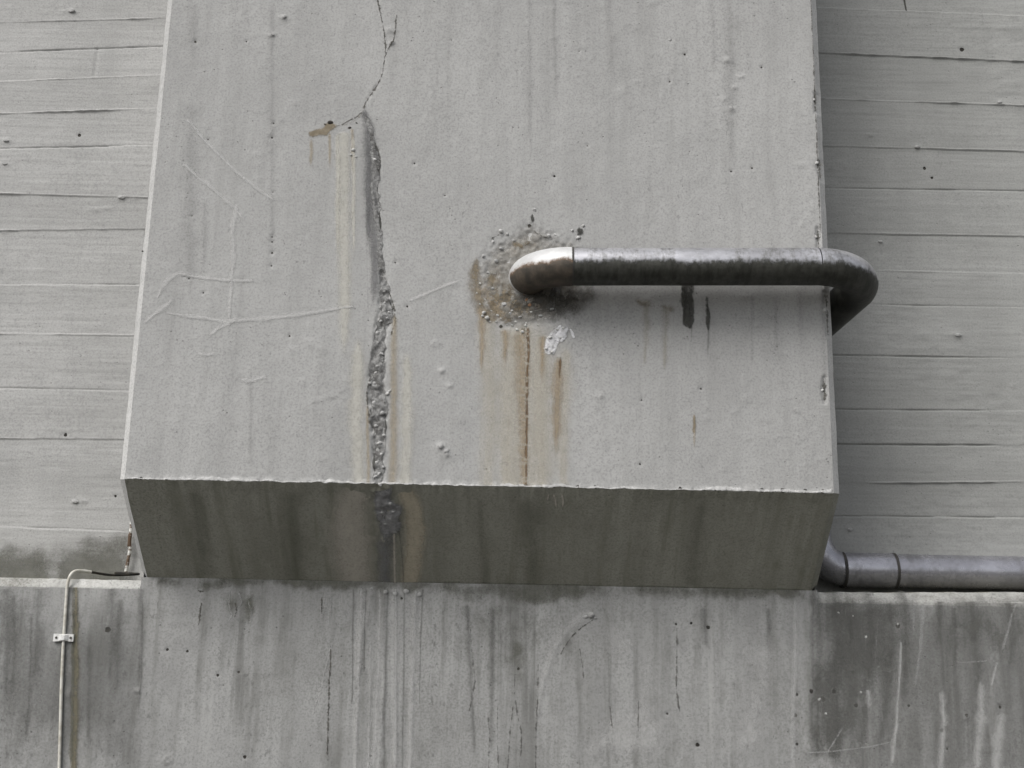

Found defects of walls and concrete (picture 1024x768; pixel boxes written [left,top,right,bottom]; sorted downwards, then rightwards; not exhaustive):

crack [338,0,397,486]
spalling [471,208,593,333]
leakage [681,286,710,330]
rust [503,328,561,487]
leakage [0,537,127,768]
leakage [892,642,901,761]
leakage [975,666,1002,768]